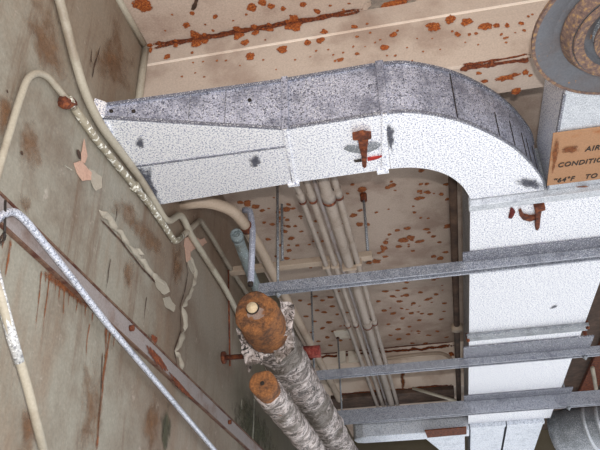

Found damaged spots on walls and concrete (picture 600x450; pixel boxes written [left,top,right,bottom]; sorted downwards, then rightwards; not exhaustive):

corrosion [147,0,362,59]
corrosion [425,0,600,95]
flaking render [64,139,102,191]
corrosion [237,200,270,212]
corrosion [262,183,367,260]
corrosion [366,227,441,264]
corrosion [0,221,93,353]
peeling [99,210,207,369]
corrosion [381,281,433,321]
corrosion [33,223,264,450]
corrosion [303,316,378,360]
corrosion [359,323,454,357]